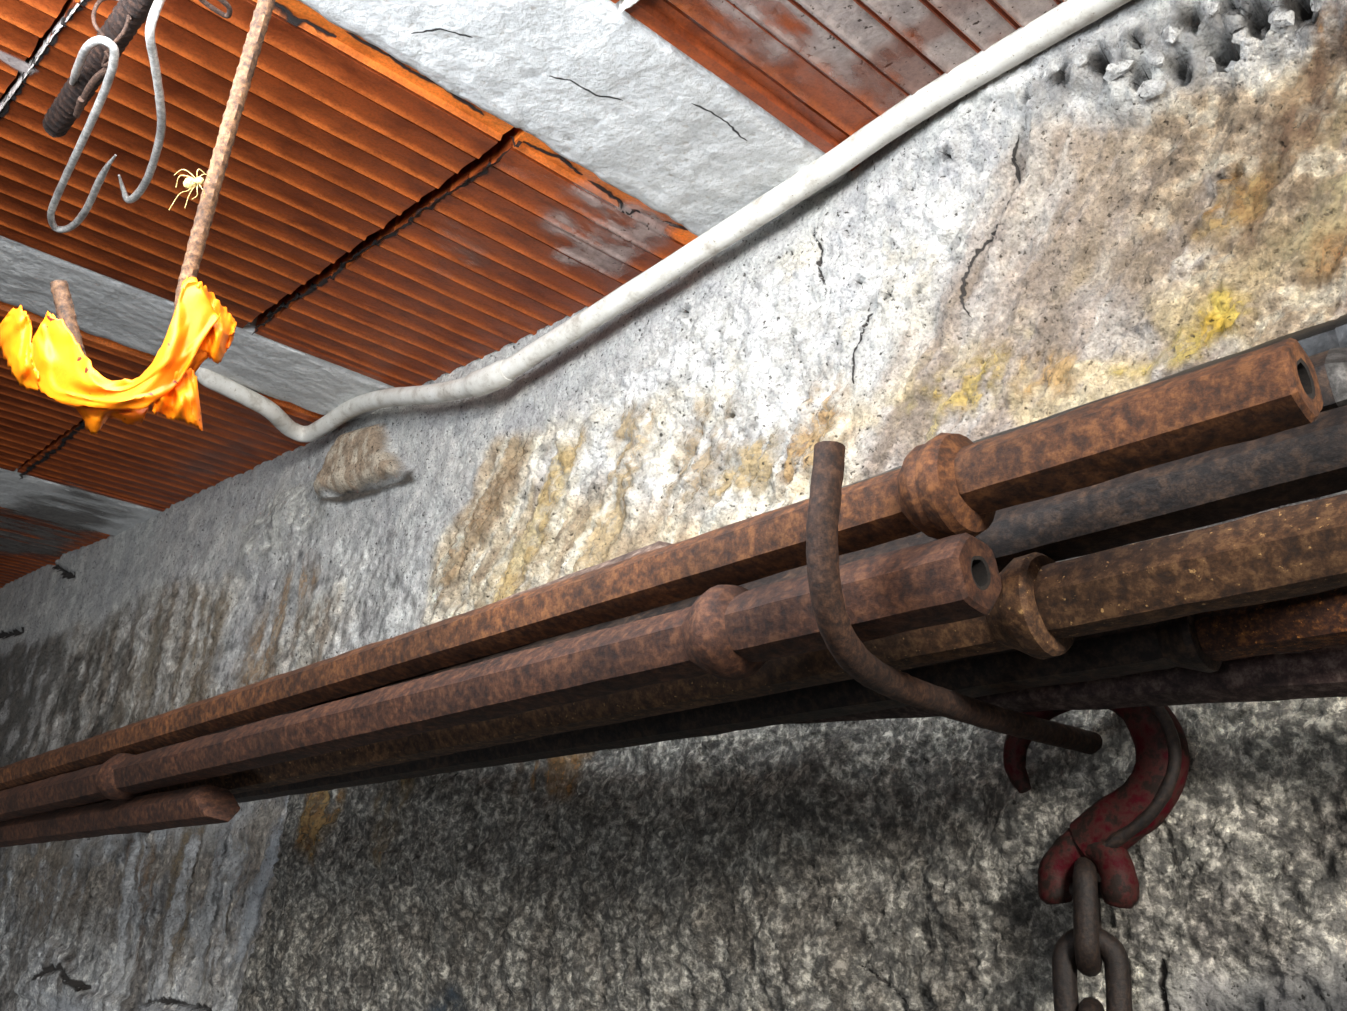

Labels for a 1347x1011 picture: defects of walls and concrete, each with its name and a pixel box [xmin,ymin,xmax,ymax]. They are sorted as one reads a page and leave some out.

spalling [1029,0,1321,101]
corrosion [1194,10,1347,253]
crack [959,134,1021,318]
corrosion [1291,173,1347,275]
corrosion [1173,291,1242,362]
corrosion [933,354,1005,406]
corrosion [708,395,838,497]
crack [32,963,92,992]